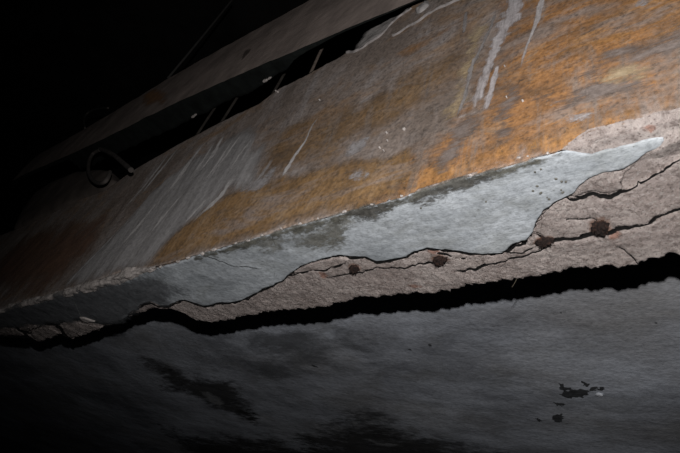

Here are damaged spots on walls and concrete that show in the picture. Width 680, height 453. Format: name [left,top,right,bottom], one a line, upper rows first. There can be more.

rust [151,0,680,265]
water stain [445,0,523,121]
water stain [522,0,544,59]
spalling [0,108,680,342]
crack [0,159,680,339]
rust [432,255,448,267]